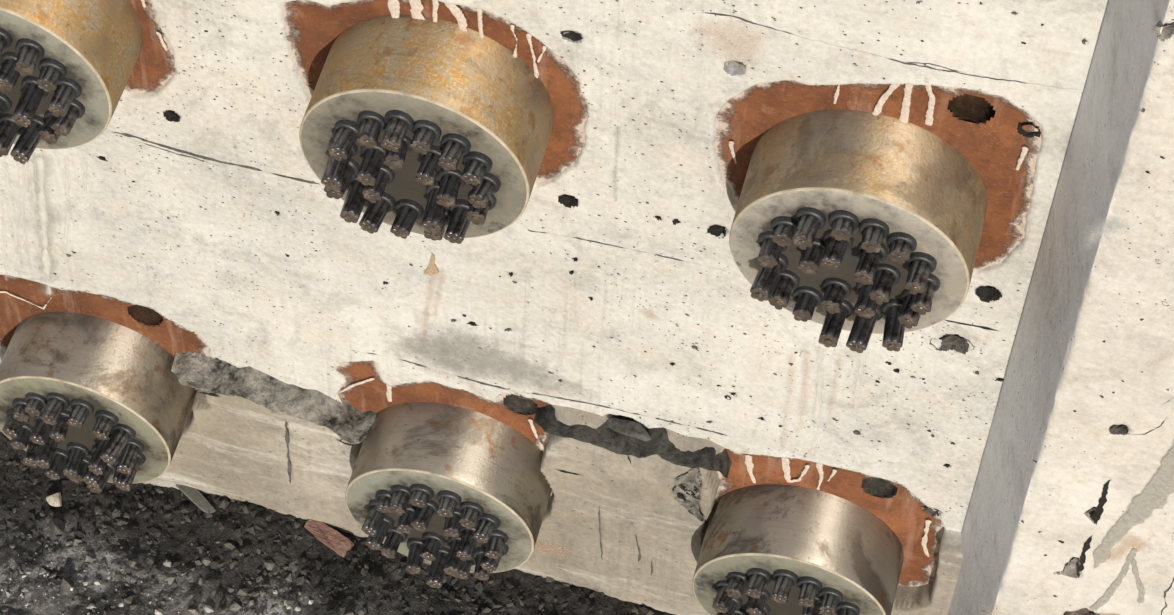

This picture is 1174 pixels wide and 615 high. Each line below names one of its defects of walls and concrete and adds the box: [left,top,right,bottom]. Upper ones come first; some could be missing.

crack [1077,479,1112,577]
crack [1161,578,1174,615]